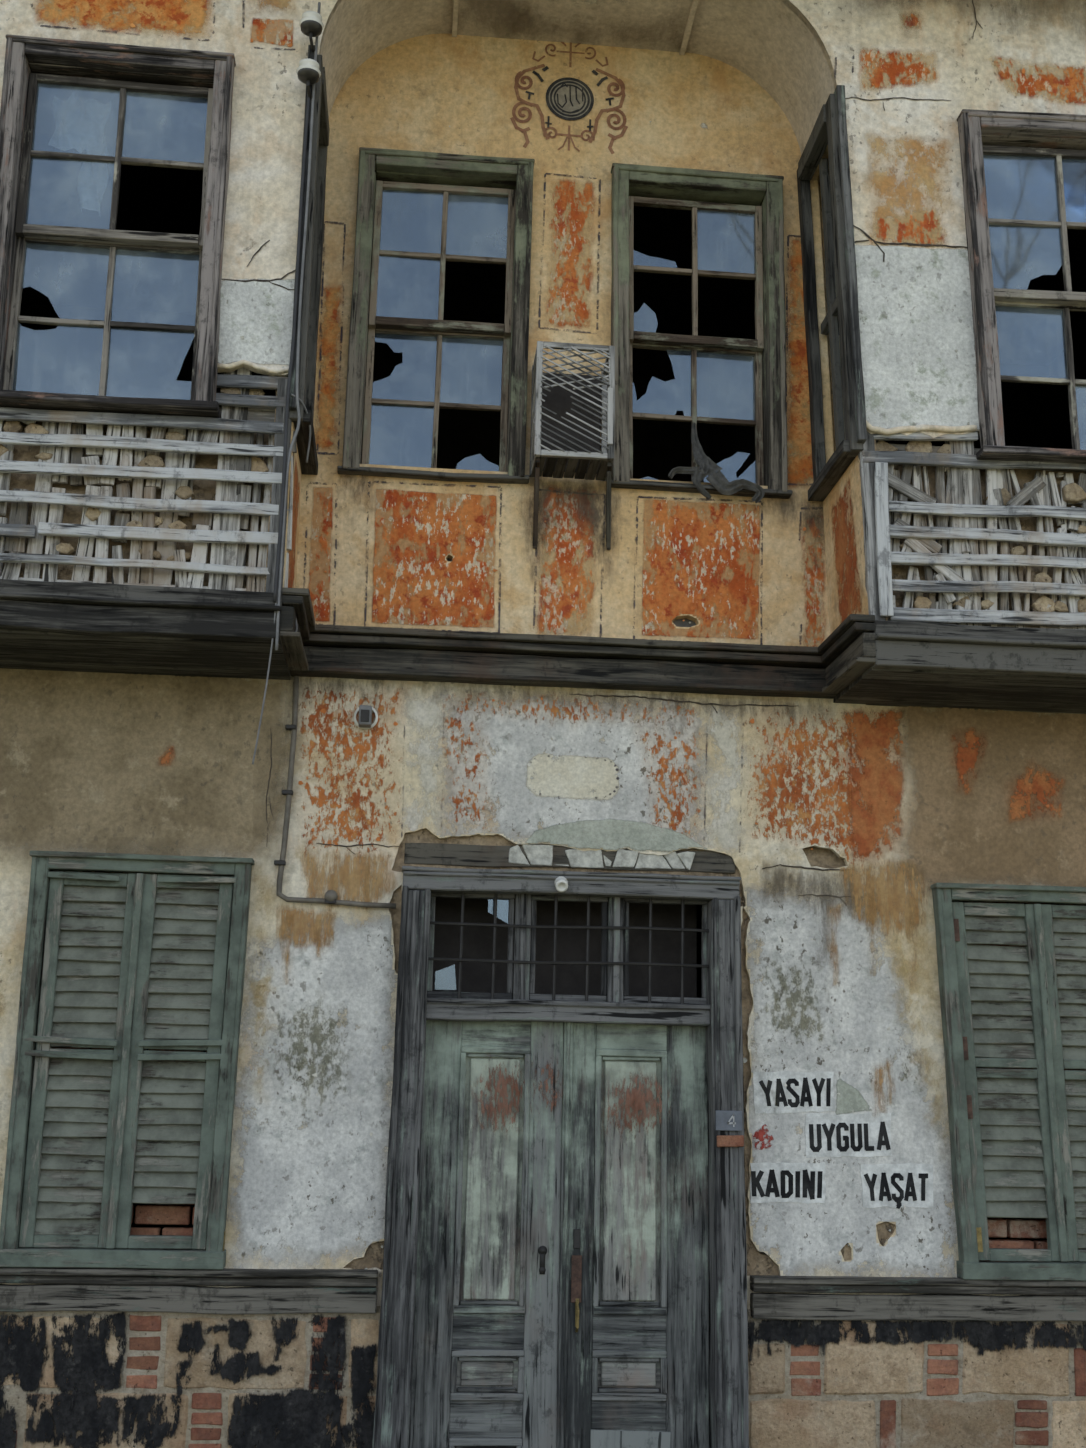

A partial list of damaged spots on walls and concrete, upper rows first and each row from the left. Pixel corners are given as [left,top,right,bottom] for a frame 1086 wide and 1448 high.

peeling [37,0,209,34]
peeling [860,49,936,89]
crack [845,97,951,111]
peeling [994,57,1086,104]
crack [854,225,968,262]
peeling [372,489,498,627]
peeling [642,500,760,639]
peeling [1009,767,1063,820]
peeling [231,687,957,1277]
leakage [280,1007,341,1098]